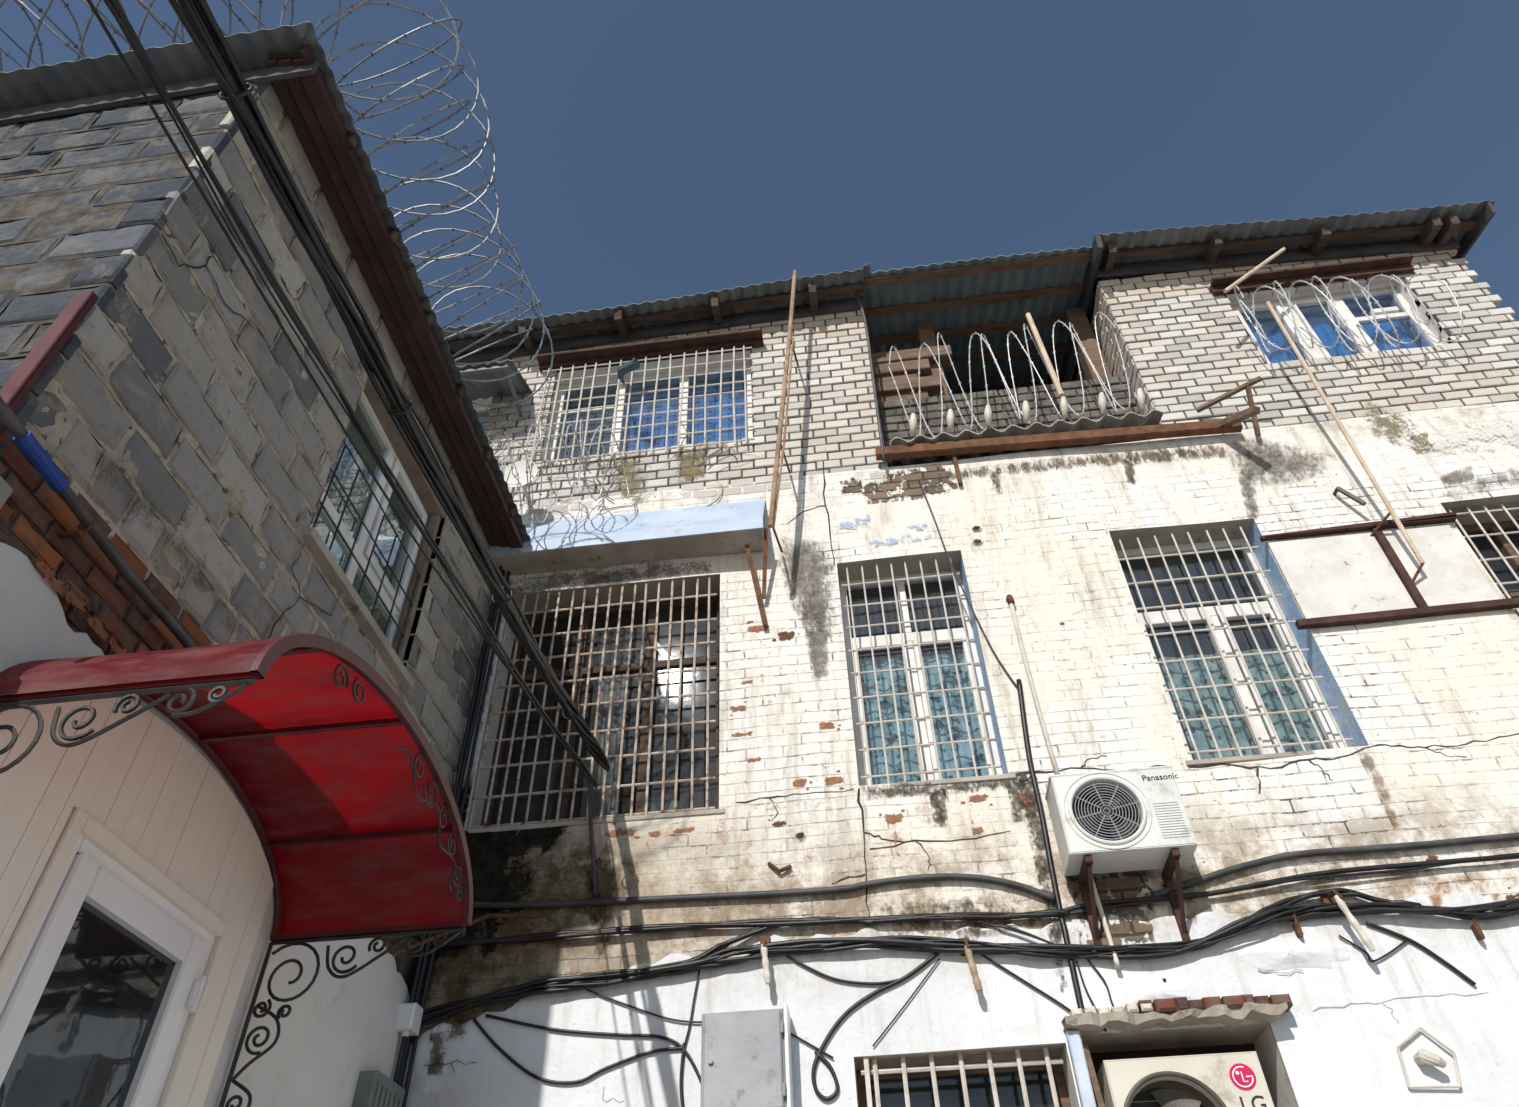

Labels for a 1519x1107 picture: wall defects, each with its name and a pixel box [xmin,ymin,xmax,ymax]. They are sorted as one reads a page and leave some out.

spalling [840,464,958,503]
peeling [35,557,133,654]
spalling [747,621,800,641]
leakage [802,602,828,678]
spalling [729,680,753,736]
spalling [793,770,844,790]
crack [1017,755,1114,783]
crack [1150,733,1519,793]
leakage [583,859,615,953]
peeling [1066,870,1175,945]